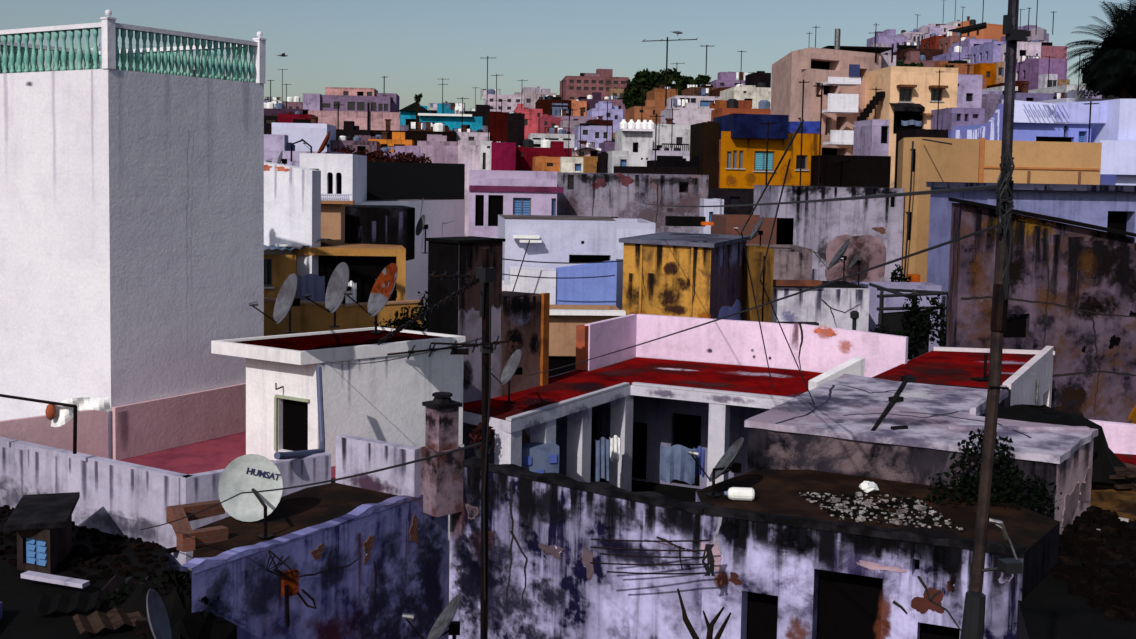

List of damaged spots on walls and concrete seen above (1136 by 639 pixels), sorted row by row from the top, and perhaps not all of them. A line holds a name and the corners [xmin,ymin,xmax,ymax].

water stain [785,167,896,221]
water stain [627,241,745,315]
water stain [503,294,538,354]
peeling [814,326,850,352]
water stain [1007,218,1136,413]
water stain [69,458,112,492]
water stain [245,558,297,616]
flaking render [311,544,325,561]
water stain [314,467,701,639]
water stain [719,517,973,594]
flaking render [911,575,955,614]
water stain [992,546,1024,597]